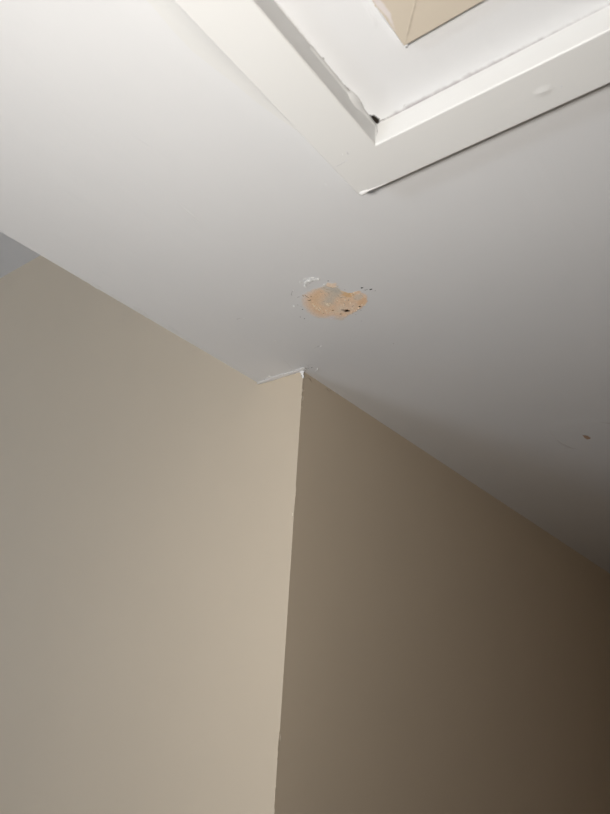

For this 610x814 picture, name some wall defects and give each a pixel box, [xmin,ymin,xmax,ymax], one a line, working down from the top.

spalling [291,277,376,321]